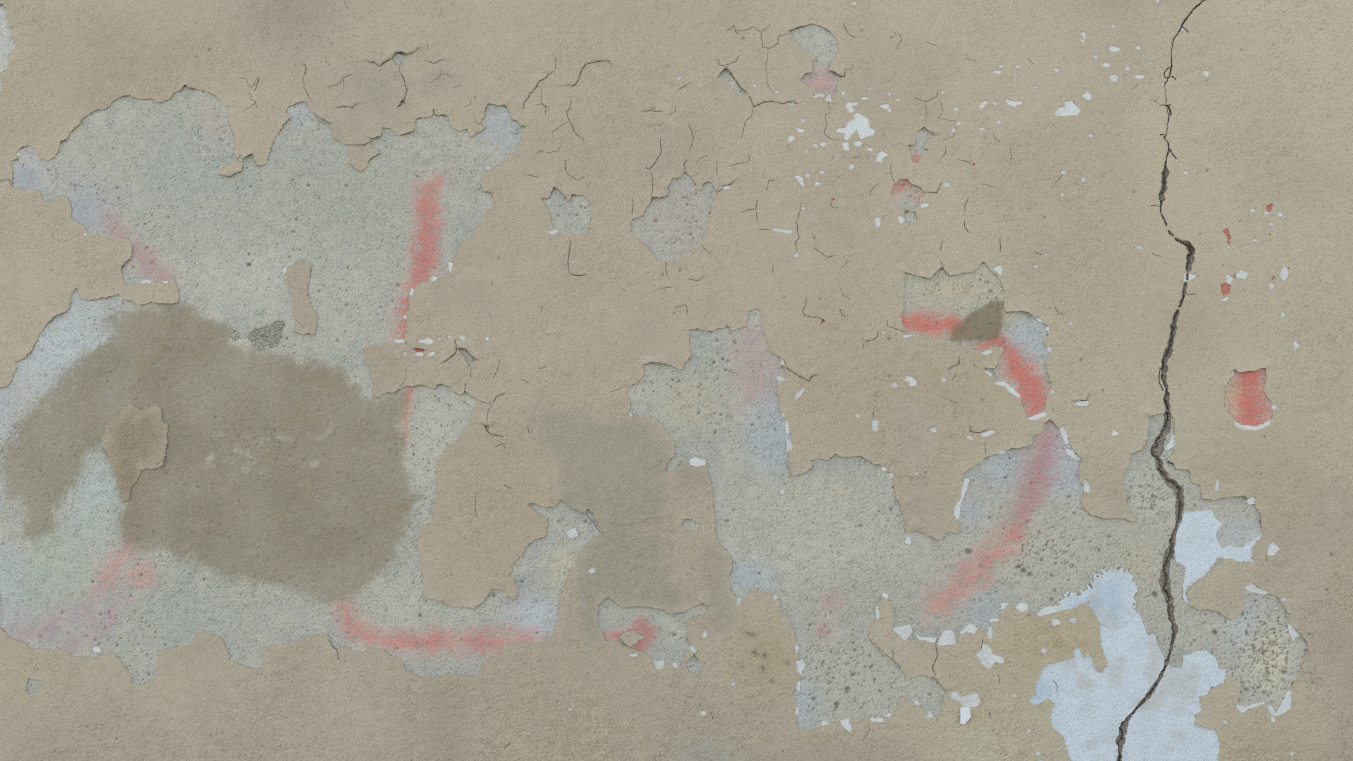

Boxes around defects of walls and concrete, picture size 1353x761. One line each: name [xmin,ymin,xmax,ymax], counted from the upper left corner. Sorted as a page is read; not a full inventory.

peeling [774,86,900,169]
peeling [1054,90,1092,116]
peeling [1094,45,1153,82]
peeling [0,85,525,441]
peeling [542,187,591,234]
peeling [631,172,730,262]
peeling [903,262,1054,394]
crack [1115,0,1205,761]
peeling [1221,269,1249,302]
peeling [0,404,169,627]
peeling [361,329,1308,761]
peeling [85,553,352,685]